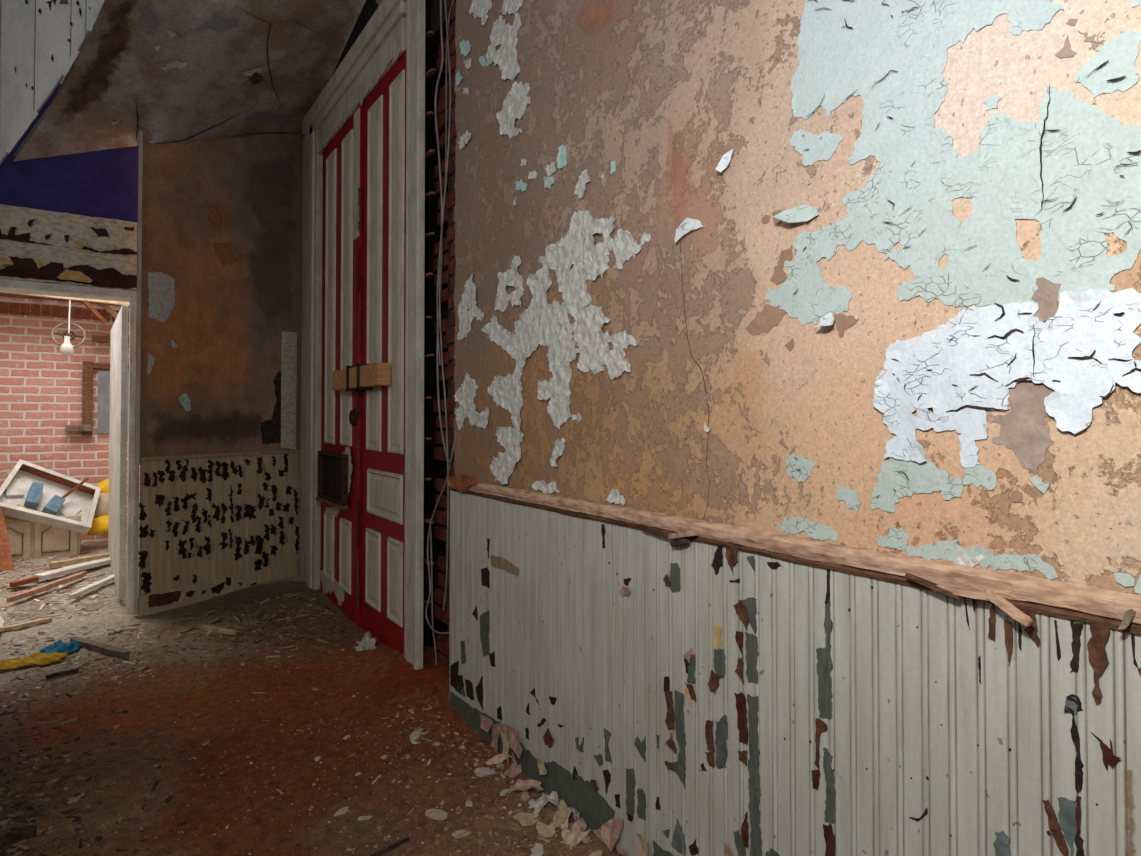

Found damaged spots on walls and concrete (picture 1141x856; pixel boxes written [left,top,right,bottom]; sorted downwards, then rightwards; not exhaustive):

peeling [134,371,300,608]
peeling [423,41,651,647]
crack [680,243,710,515]
crack [802,70,898,151]
peeling [745,0,1141,474]
crack [892,246,1141,412]
crack [1039,84,1132,235]
crack [1090,60,1126,81]
crack [1114,150,1141,177]
peeling [572,597,780,856]
peeling [809,569,836,856]
peeling [1042,609,1141,856]